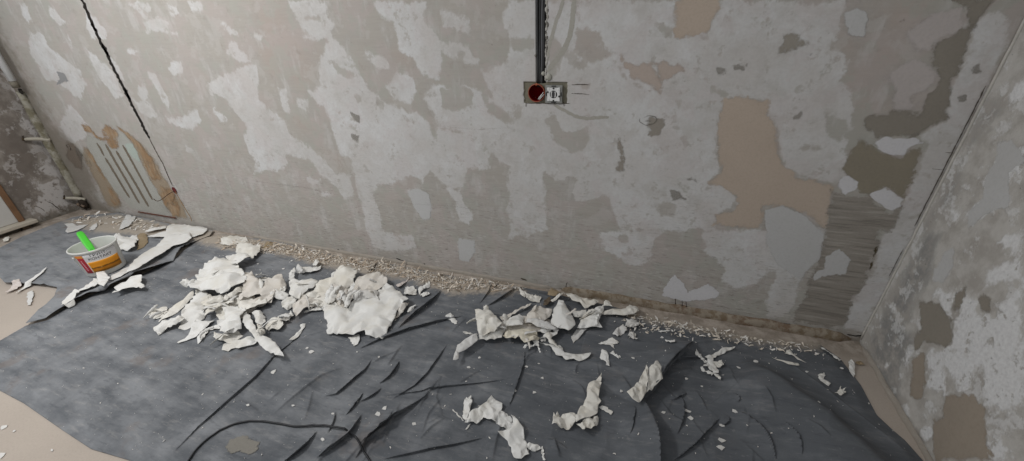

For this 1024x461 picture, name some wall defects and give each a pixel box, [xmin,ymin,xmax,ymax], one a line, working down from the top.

crack [81,0,172,184]
peeling [620,54,685,94]
peeling [672,0,723,39]
peeling [794,0,993,329]
peeling [909,287,992,400]
peeling [932,393,995,461]